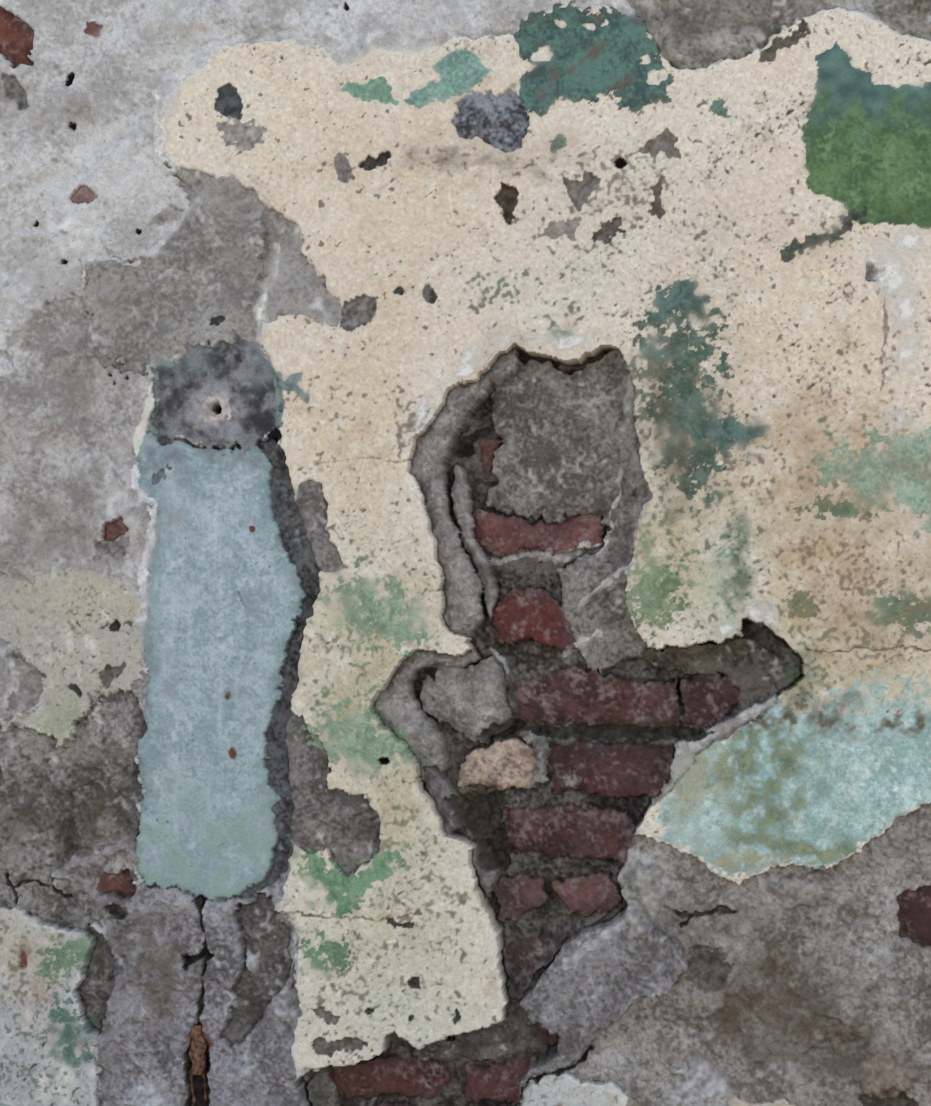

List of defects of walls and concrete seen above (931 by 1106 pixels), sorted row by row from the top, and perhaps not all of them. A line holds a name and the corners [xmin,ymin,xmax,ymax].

peeling [248,207,379,339]
peeling [631,278,771,505]
peeling [296,480,347,584]
peeling [331,575,436,655]
peeling [621,557,700,639]
peeling [285,705,422,918]
peeling [655,677,931,877]
crack [192,895,211,1021]
peeling [386,918,415,929]
peeling [408,977,421,990]
spalling [897,886,931,948]
corrosion [188,1024,211,1106]